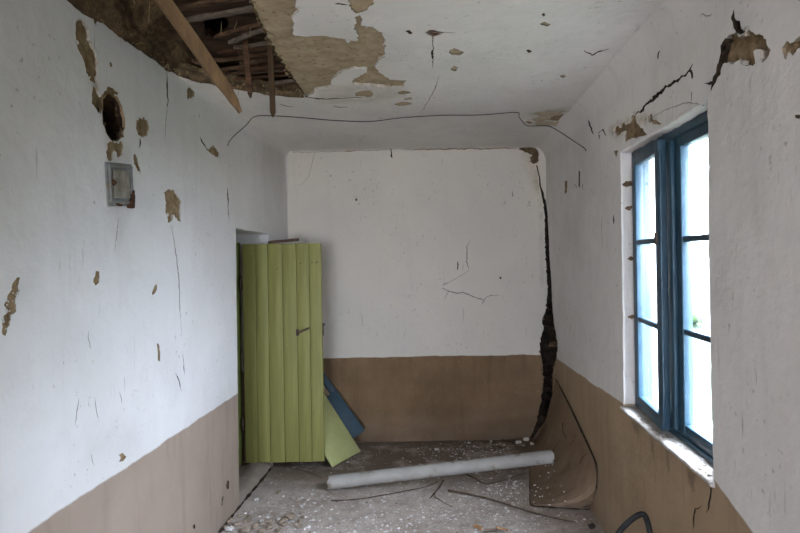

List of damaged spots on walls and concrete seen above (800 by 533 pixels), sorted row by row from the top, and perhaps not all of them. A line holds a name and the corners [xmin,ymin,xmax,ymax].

spalling [75,19,125,161]
spalling [333,0,374,43]
spalling [303,30,412,106]
crack [636,10,745,118]
spalling [727,26,771,66]
spalling [782,36,800,59]
spalling [136,117,149,138]
spalling [614,111,661,143]
spalling [164,189,181,223]
peeling [2,277,20,335]
crack [443,242,504,305]
crack [530,165,558,439]